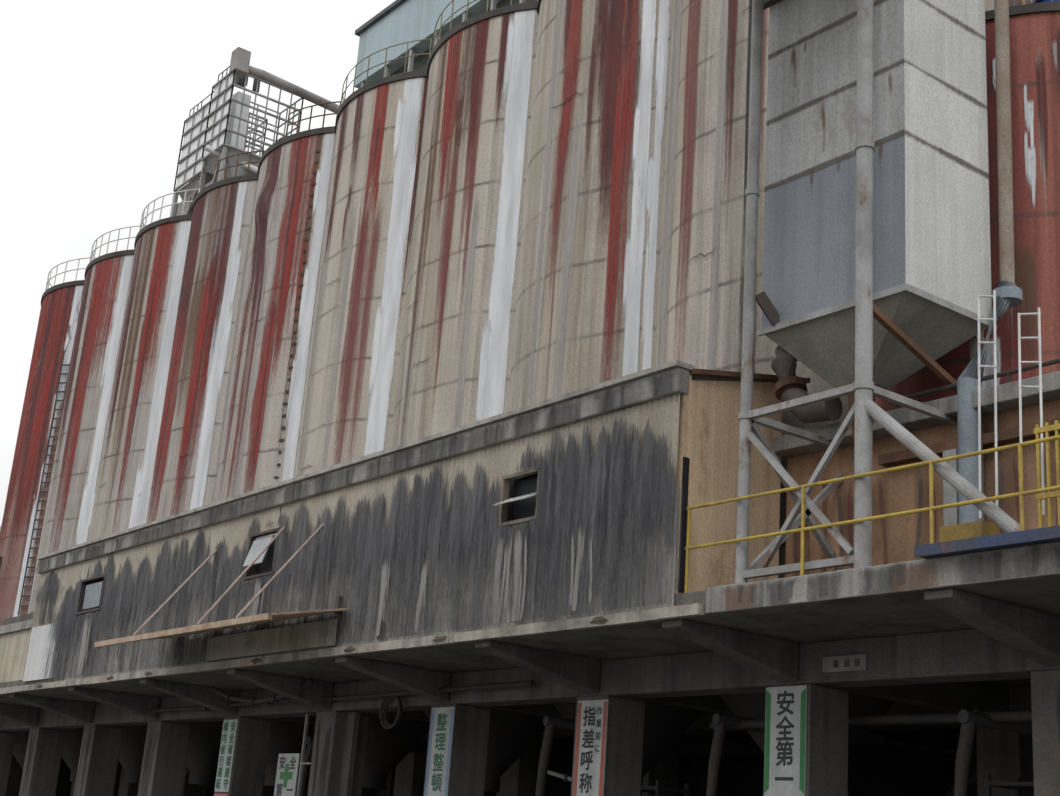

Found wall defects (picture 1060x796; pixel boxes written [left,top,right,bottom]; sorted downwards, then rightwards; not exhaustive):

corrosion [0,222,176,552]
corrosion [147,182,239,520]
corrosion [225,134,323,497]
water stain [298,218,333,472]
water stain [32,404,681,681]
corrosion [326,83,389,447]
corrosion [402,19,489,374]
corrosion [496,13,509,112]
water stain [553,122,582,397]
corrosion [550,0,640,382]
corrosion [726,0,737,156]
peeling [1024,85,1036,204]